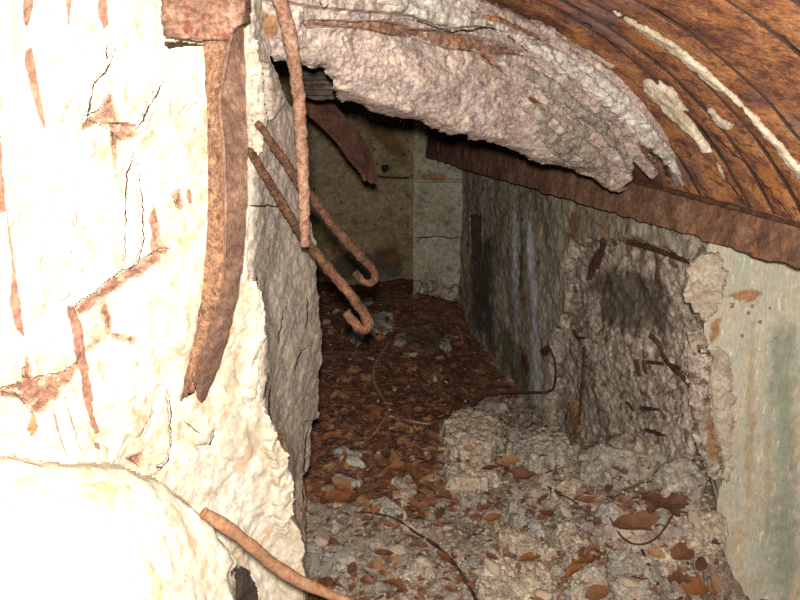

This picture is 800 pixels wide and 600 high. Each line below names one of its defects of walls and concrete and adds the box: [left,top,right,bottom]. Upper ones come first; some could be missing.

corrosion [163,40,203,49]
corrosion [482,15,541,41]
crack [61,43,117,126]
crack [136,79,165,129]
corrosion [639,142,672,178]
crack [121,152,145,272]
corrosion [586,249,599,280]
water stain [592,271,668,329]
corrosion [732,290,759,301]
spalling [545,236,735,463]
corrosion [27,413,38,436]
peeling [707,344,738,493]